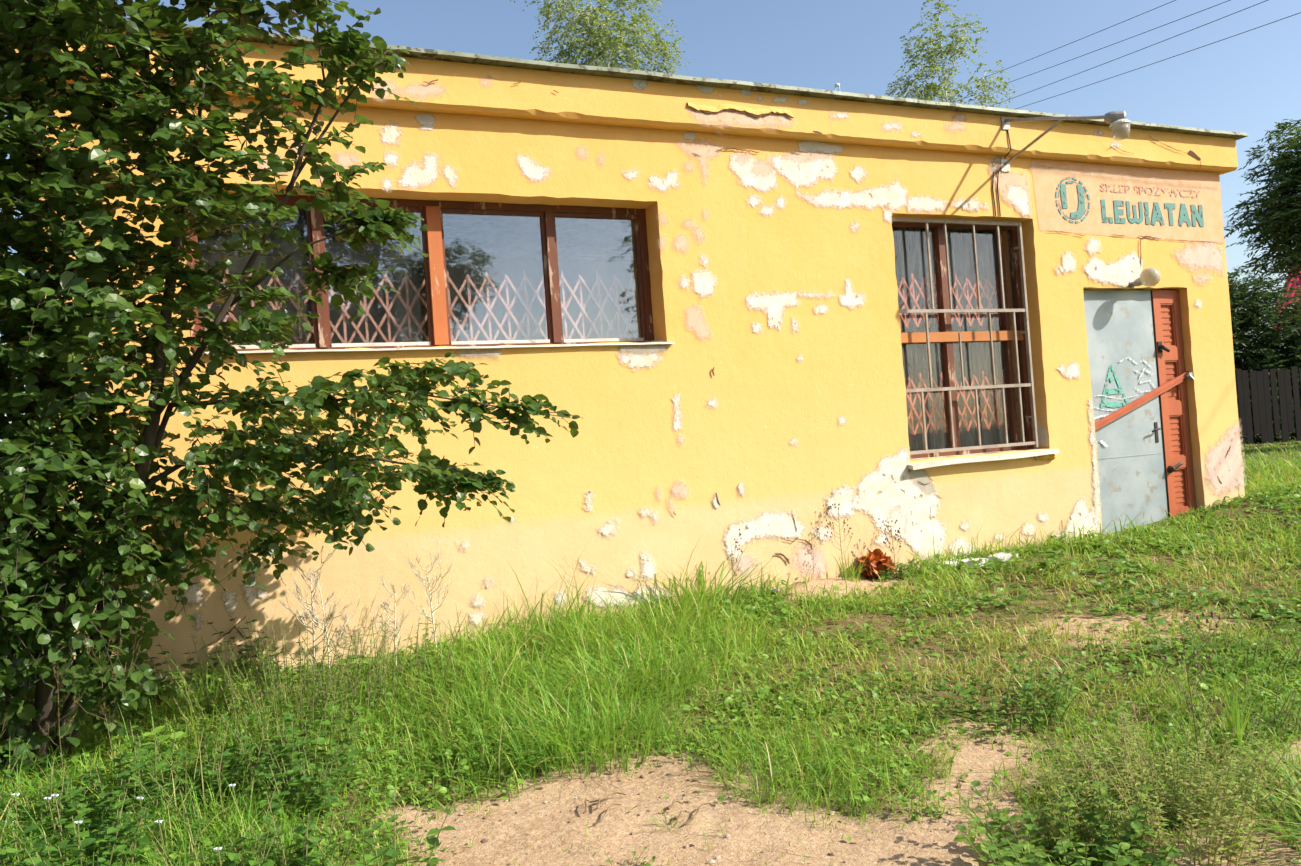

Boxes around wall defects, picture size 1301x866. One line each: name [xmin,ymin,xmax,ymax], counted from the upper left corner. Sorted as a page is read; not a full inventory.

peeling [373,81,444,99]
peeling [380,114,458,190]
peeling [517,154,552,183]
peeling [623,85,1031,234]
peeling [660,209,717,339]
peeling [744,279,866,333]
peeling [1055,237,1143,287]
peeling [1175,242,1226,308]
peeling [618,352,662,372]
peeling [1022,398,1102,544]
peeling [1206,424,1245,494]
peeling [723,447,982,576]